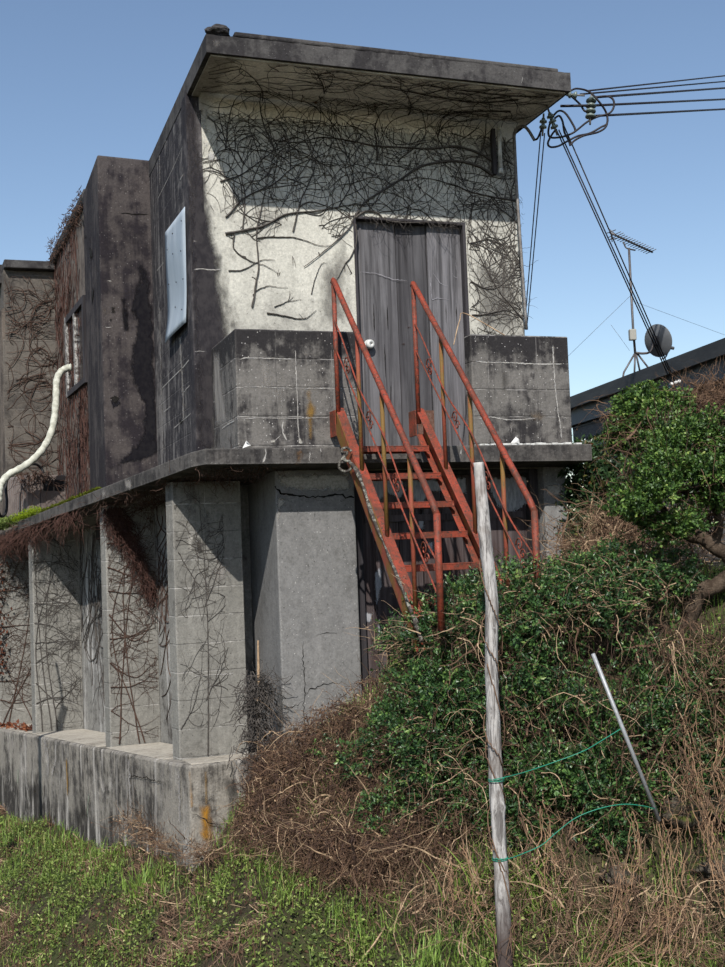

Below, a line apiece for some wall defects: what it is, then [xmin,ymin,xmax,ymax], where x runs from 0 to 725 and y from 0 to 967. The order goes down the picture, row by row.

leakage [121,265,234,464]
crack [274,486,354,501]
crack [285,647,342,723]